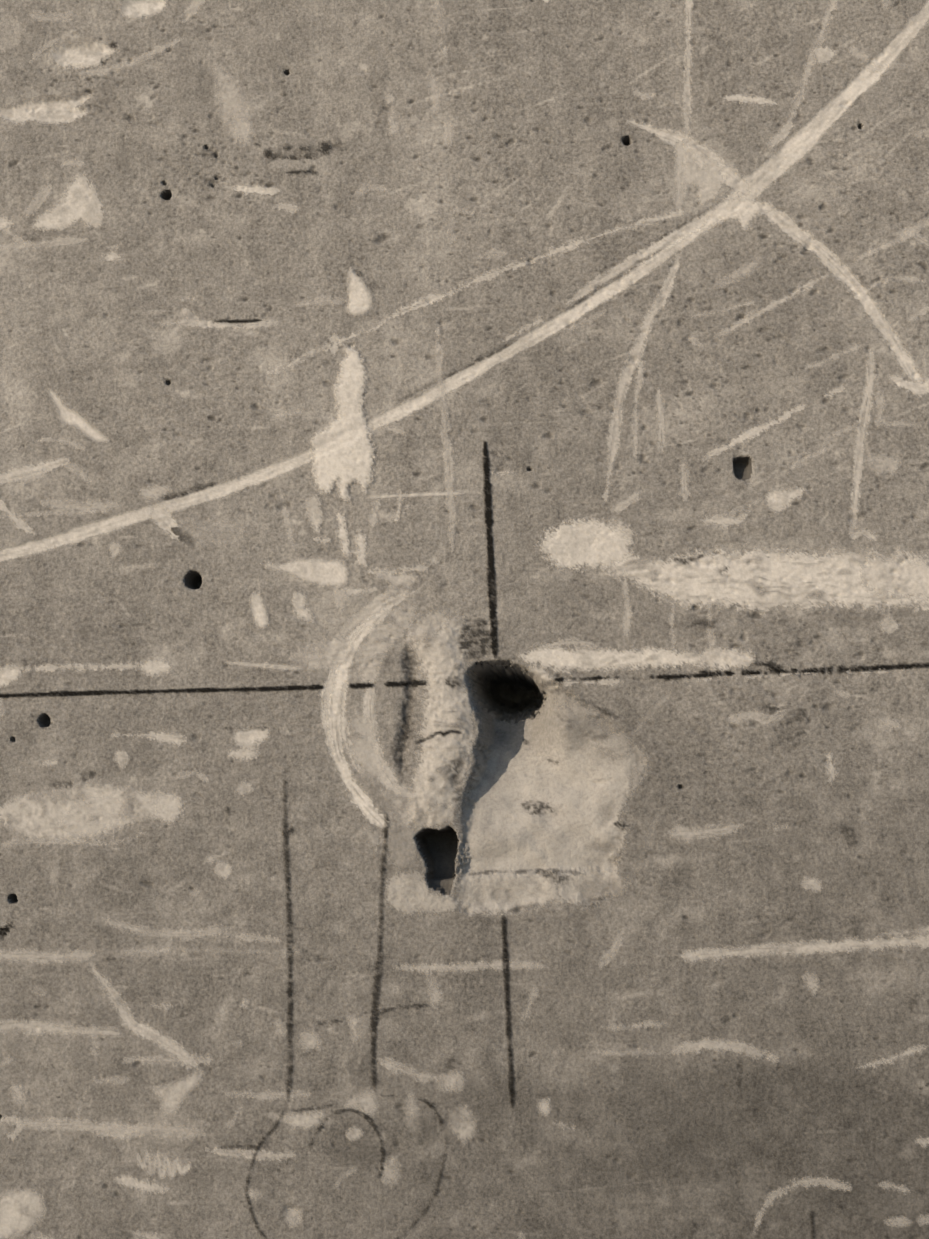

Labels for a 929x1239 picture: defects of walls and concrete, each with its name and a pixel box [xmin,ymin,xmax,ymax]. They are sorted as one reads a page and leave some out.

peeling [598,733,648,793]
peeling [363,826,418,867]